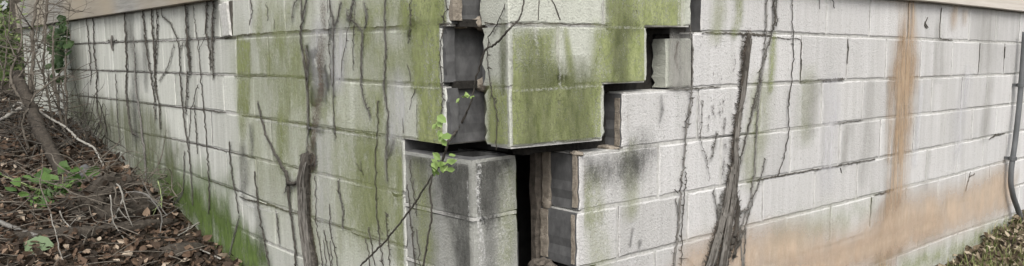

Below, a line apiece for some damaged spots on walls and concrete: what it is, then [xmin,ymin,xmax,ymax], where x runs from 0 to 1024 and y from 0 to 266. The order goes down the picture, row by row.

crack [68,0,849,266]
damp [613,22,629,83]
crack [747,159,875,183]
rust [687,1,1010,266]